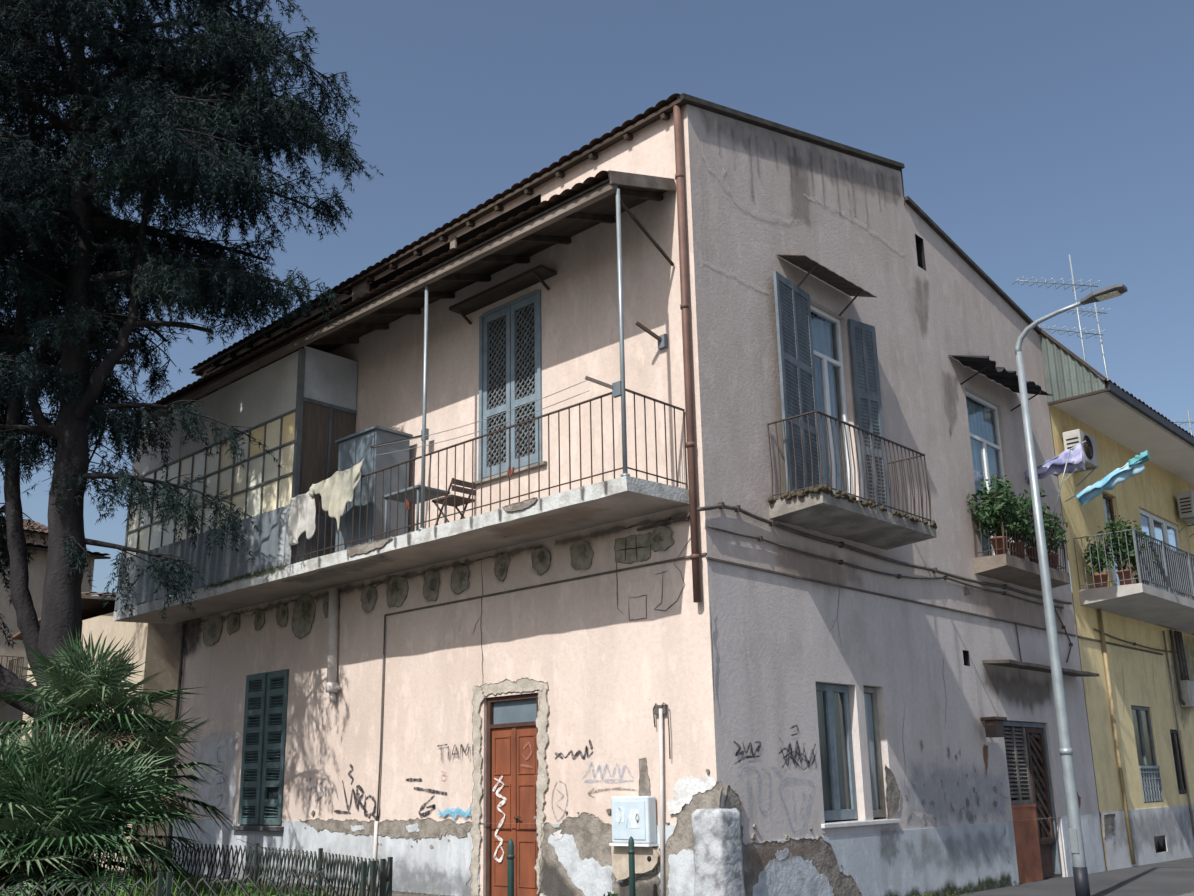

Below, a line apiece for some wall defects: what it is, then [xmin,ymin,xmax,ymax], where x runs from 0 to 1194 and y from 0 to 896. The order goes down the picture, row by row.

spalling [348,536,392,556]
spalling [361,575,409,613]
spalling [423,565,470,601]
spalling [494,552,511,582]
spalling [531,546,551,576]
spalling [570,539,594,571]
spalling [614,525,675,564]
flaking render [299,677,863,896]